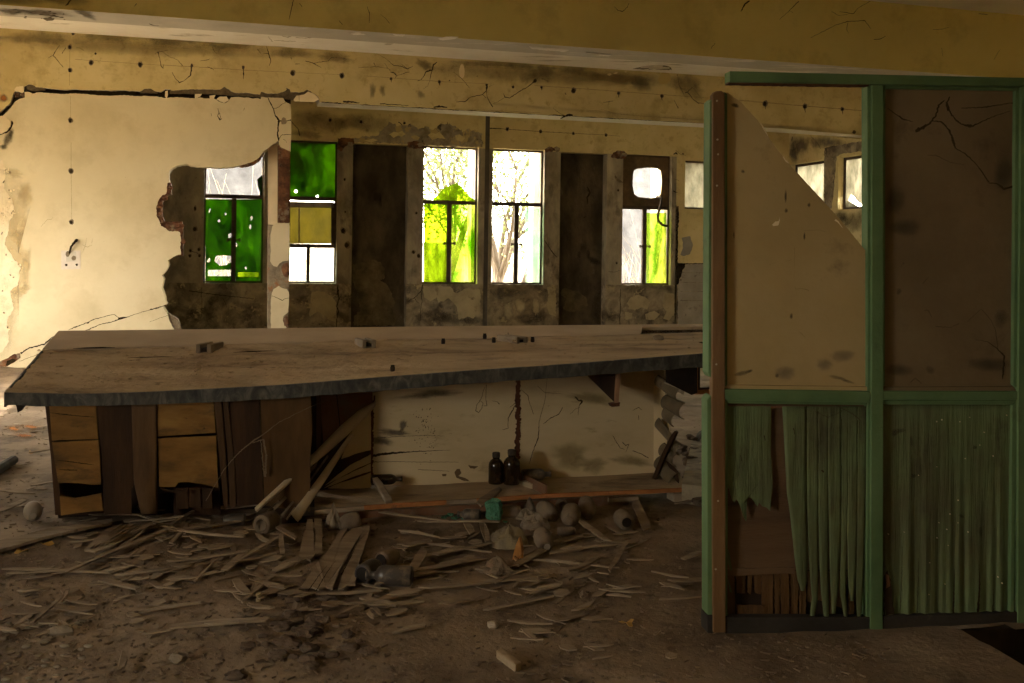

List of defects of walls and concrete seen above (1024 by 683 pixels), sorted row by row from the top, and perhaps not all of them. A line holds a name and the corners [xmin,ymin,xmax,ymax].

crack [0,45,345,143]
crack [370,74,704,136]
peeling [0,160,21,367]
spalling [156,183,201,258]
peeling [270,223,290,267]
crack [20,305,168,361]
spalling [167,312,182,330]
peeling [271,286,289,328]
peeling [423,285,481,320]
peeling [546,286,556,317]